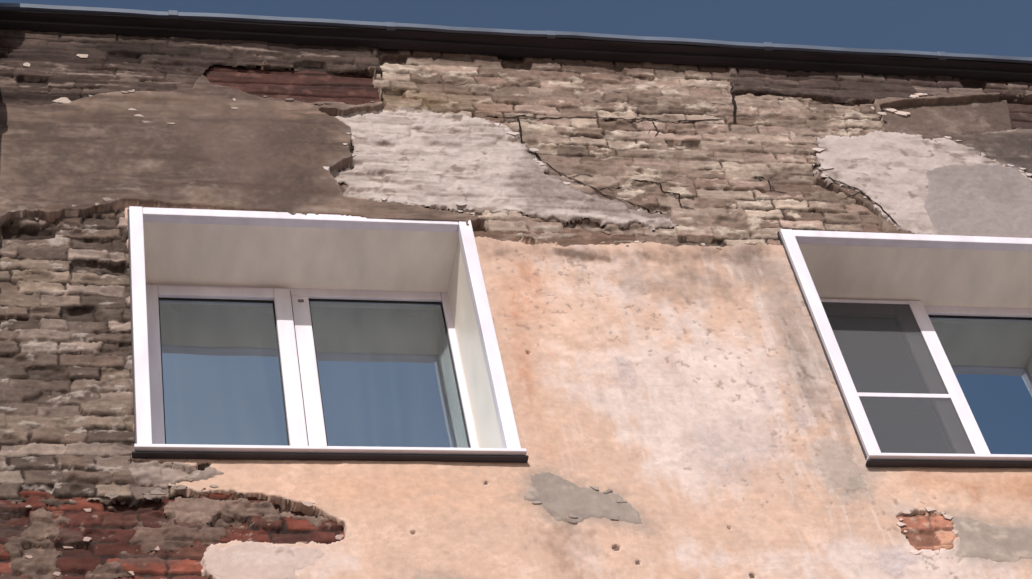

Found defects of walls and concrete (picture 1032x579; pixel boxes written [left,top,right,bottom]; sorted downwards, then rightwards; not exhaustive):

crack [485,86,737,215]
flaking render [203,49,1032,250]
flaking render [0,197,345,579]
spalling [896,507,958,555]